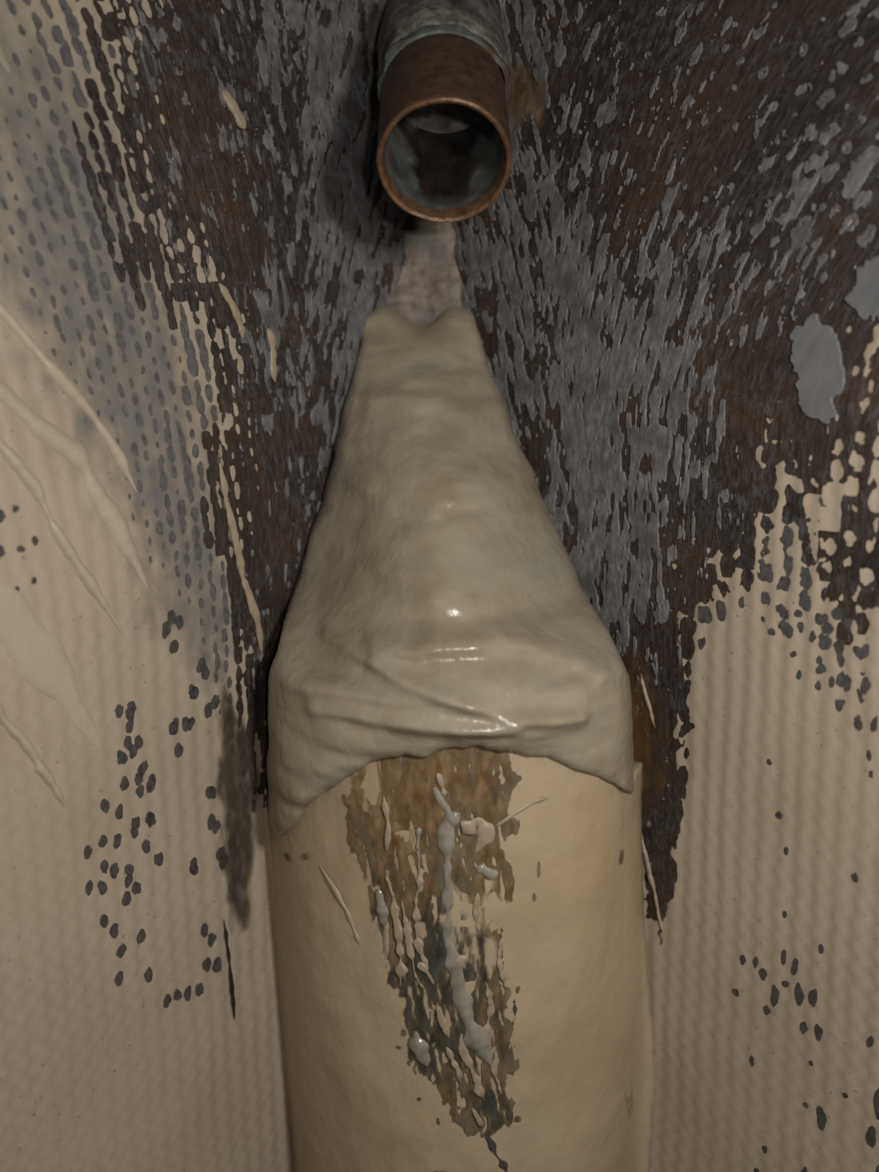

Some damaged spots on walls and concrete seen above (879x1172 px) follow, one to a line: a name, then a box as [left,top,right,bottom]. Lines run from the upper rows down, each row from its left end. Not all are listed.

leakage [9,106,223,628]
leakage [217,694,257,927]
peeling [342,746,522,1137]